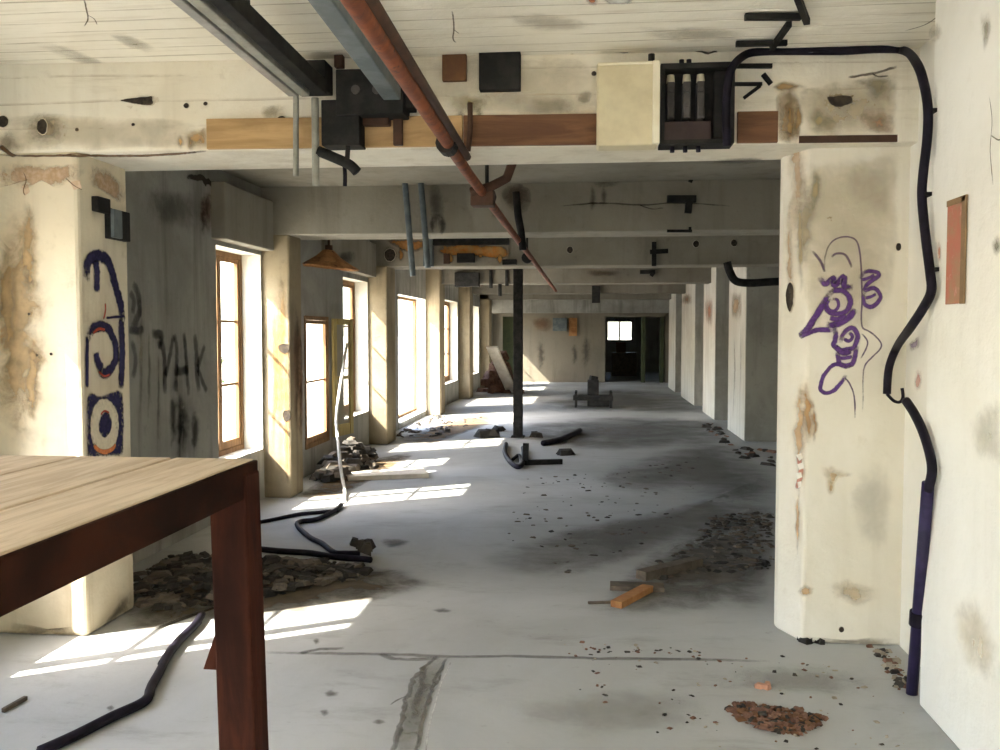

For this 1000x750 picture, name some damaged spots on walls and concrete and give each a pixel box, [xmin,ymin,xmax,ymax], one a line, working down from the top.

water stain [815,80,885,130]
peeling [4,166,82,195]
peeling [95,171,119,198]
peeling [796,453,804,488]
crack [302,648,722,750]